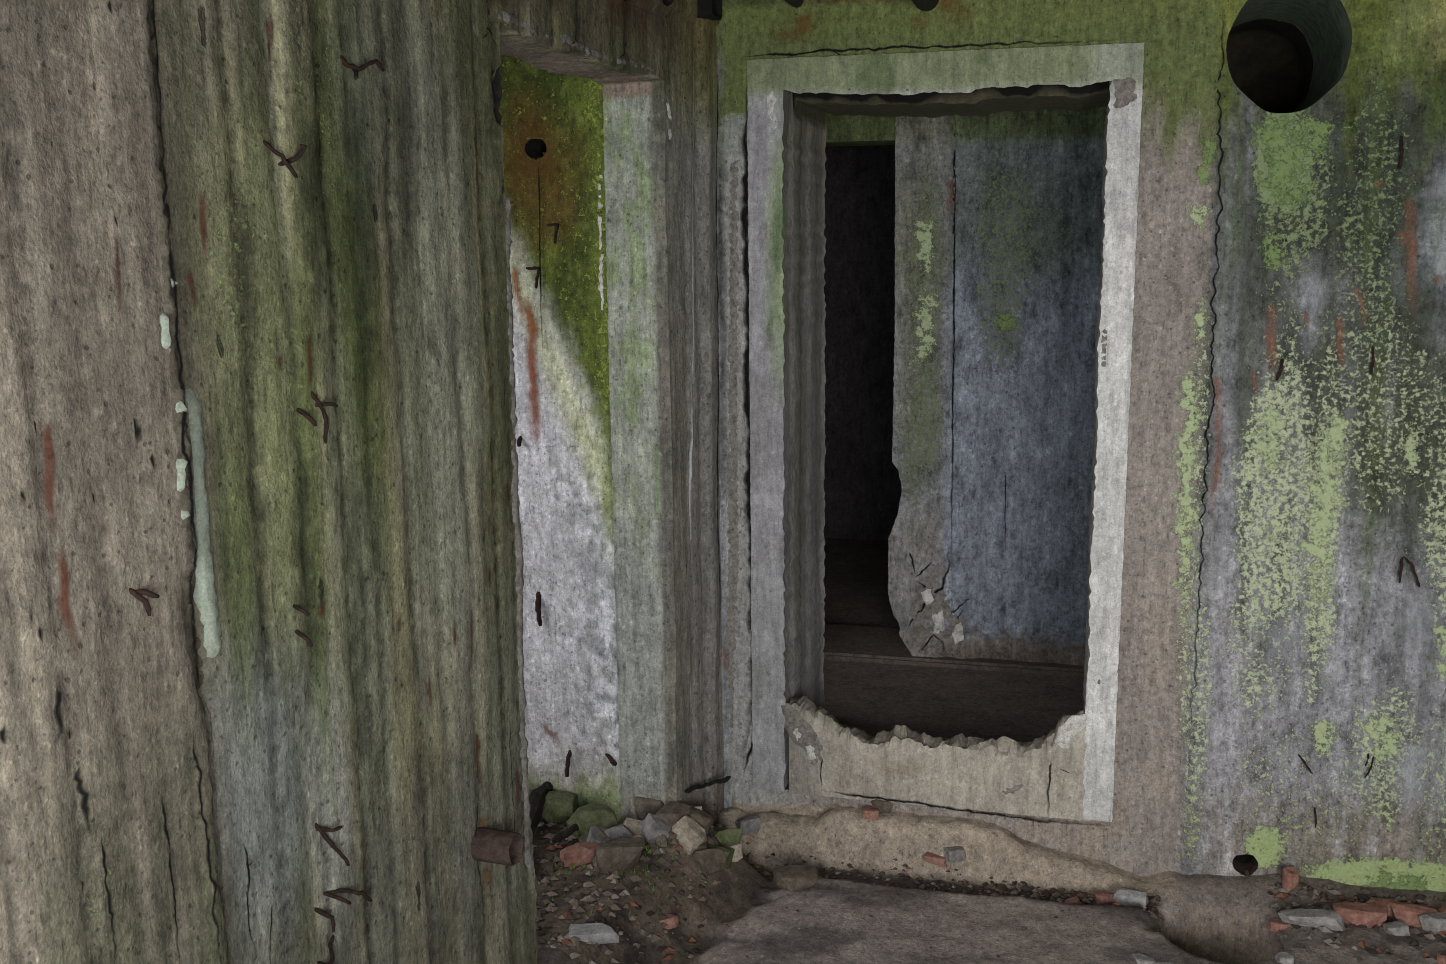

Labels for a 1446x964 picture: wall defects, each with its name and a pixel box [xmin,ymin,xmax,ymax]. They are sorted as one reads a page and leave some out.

crack [756,41,1060,56]
rust [513,269,538,423]
crack [1190,21,1225,721]
crack [134,0,272,964]
spalling [909,565,966,654]
crack [0,728,8,743]
spalling [781,703,823,766]
spalling [1055,714,1087,748]
crack [54,691,116,964]